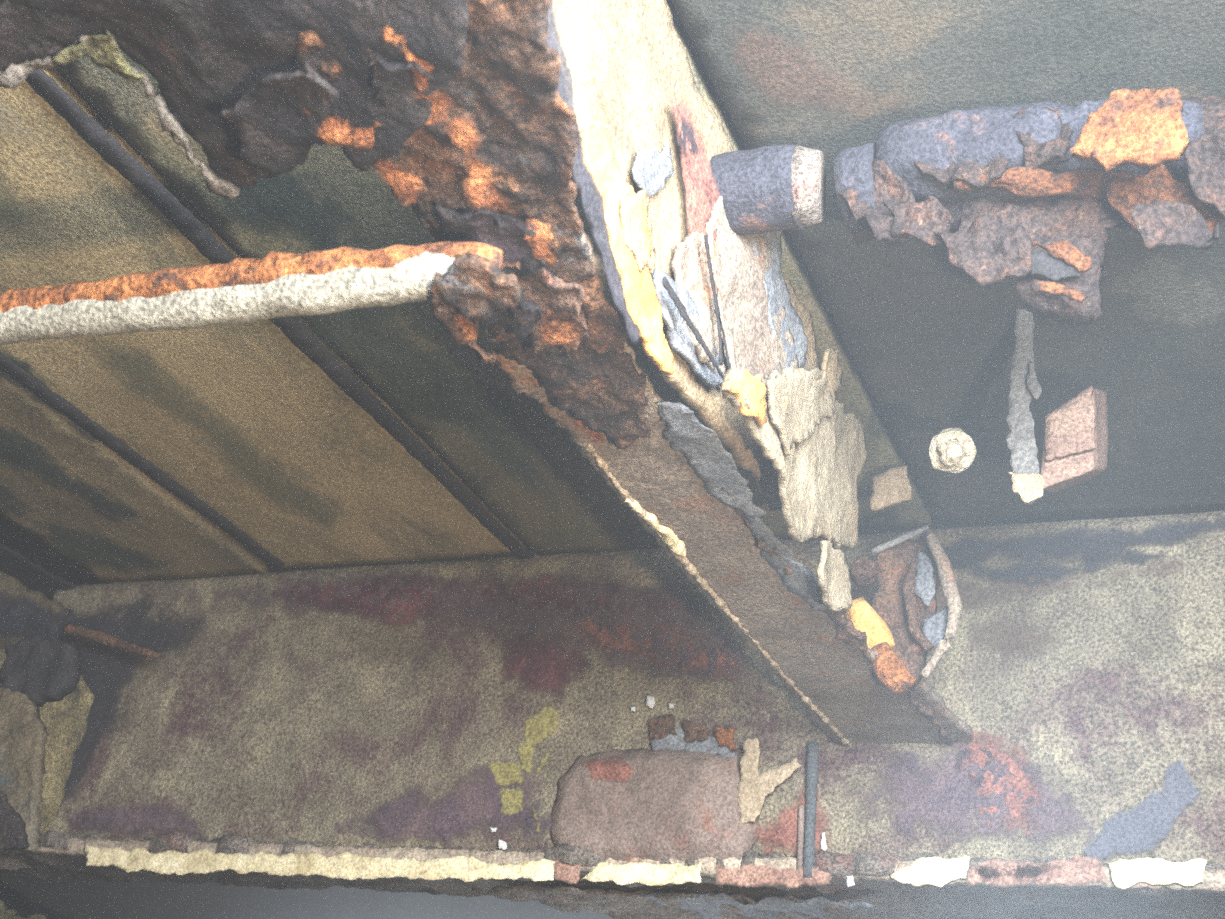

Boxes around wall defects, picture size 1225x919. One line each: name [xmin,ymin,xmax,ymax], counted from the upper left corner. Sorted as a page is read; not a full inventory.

rust [318,116,426,203]
peeling [367,55,437,108]
rust [384,27,512,213]
rust [832,107,1225,288]
rust [0,241,522,344]
peeling [431,203,591,366]
rust [525,219,556,265]
rust [539,322,579,346]
spalling [580,123,867,612]
leakage [630,695,674,712]
leakage [489,826,507,850]